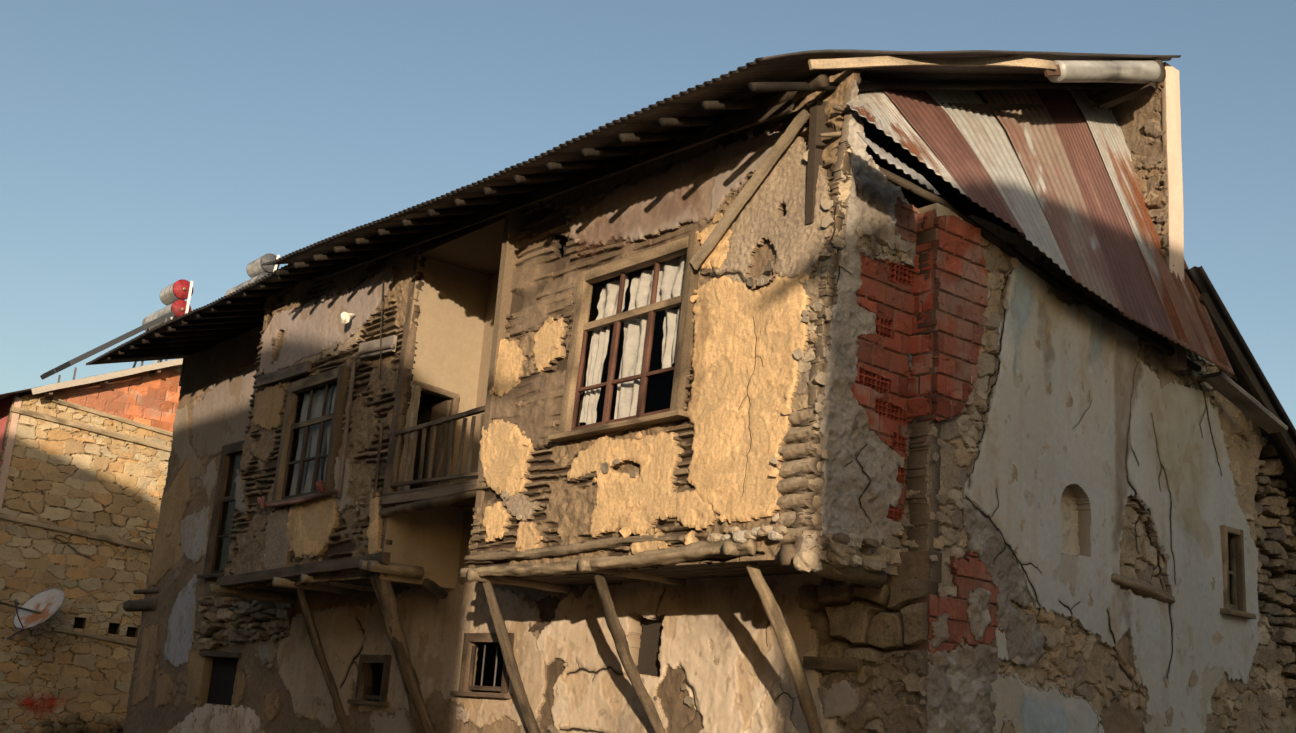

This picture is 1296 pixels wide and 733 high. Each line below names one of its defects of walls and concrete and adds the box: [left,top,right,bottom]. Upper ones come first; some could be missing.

rust [888,124,923,160]
rust [1127,177,1165,258]
spalling [1034,251,1085,305]
peeling [147,130,1019,733]
crack [844,444,872,523]
spalling [1119,496,1170,598]
spalling [1135,323,1296,733]
crack [560,725,604,733]
crack [567,659,623,681]
crack [679,664,702,729]
spalling [958,600,1188,733]